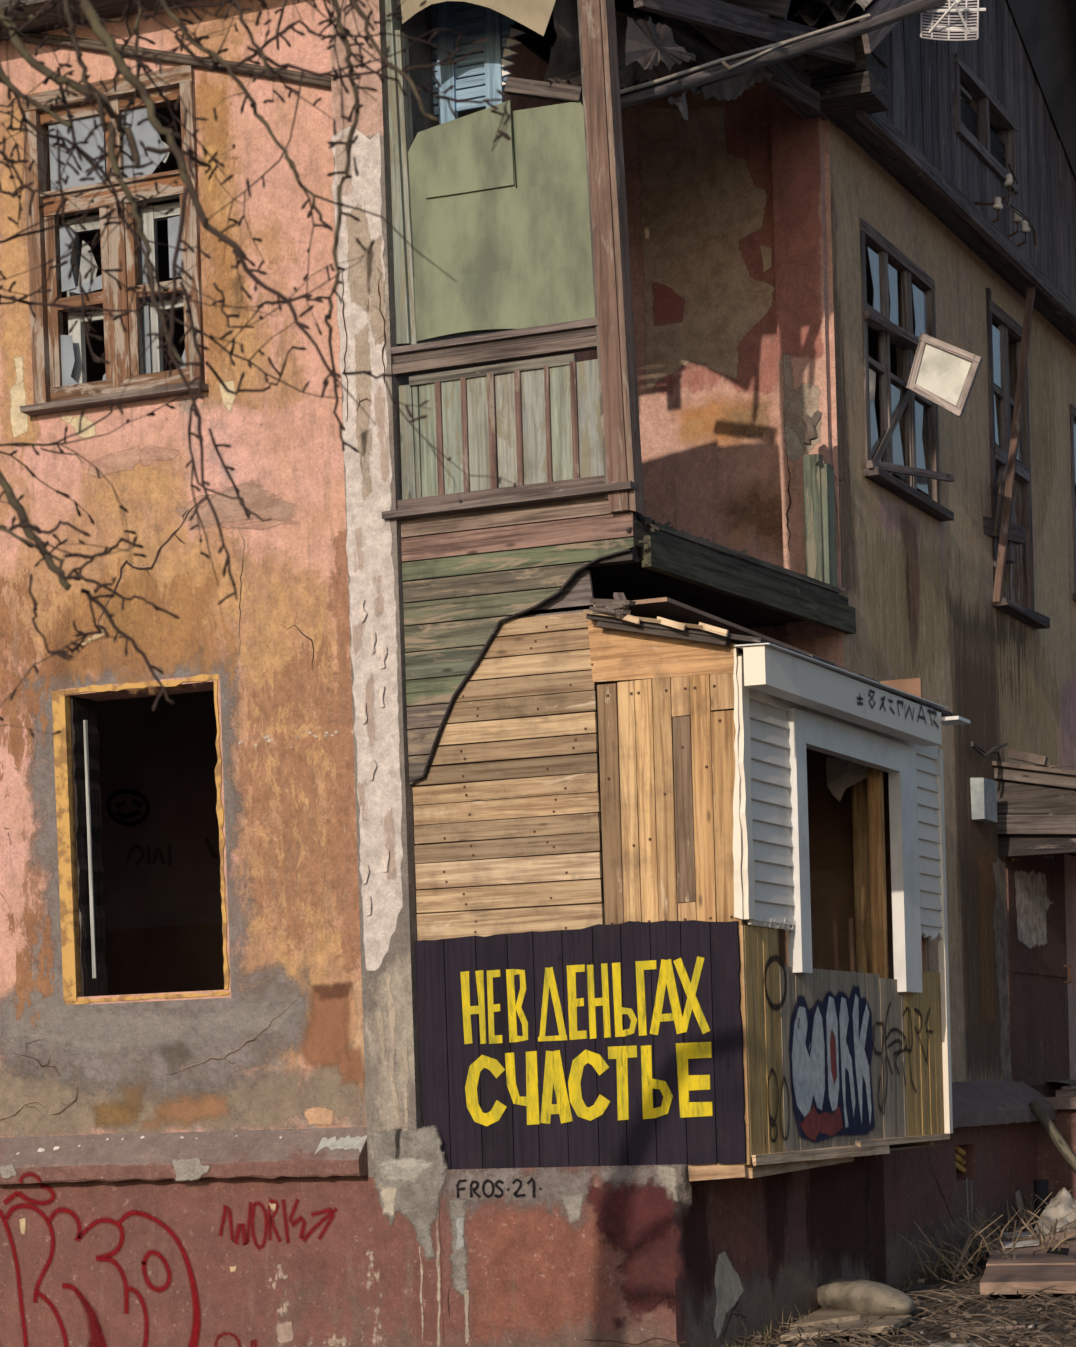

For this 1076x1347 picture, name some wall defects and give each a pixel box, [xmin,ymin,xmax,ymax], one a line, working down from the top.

flaking render [637,106,775,389]
flaking render [782,353,822,462]
peeling [297,126,403,1090]
peeling [0,569,60,798]
peeling [5,905,54,1027]
crack [1,1038,78,1120]
crack [168,999,298,1075]
flaking render [304,1106,333,1125]